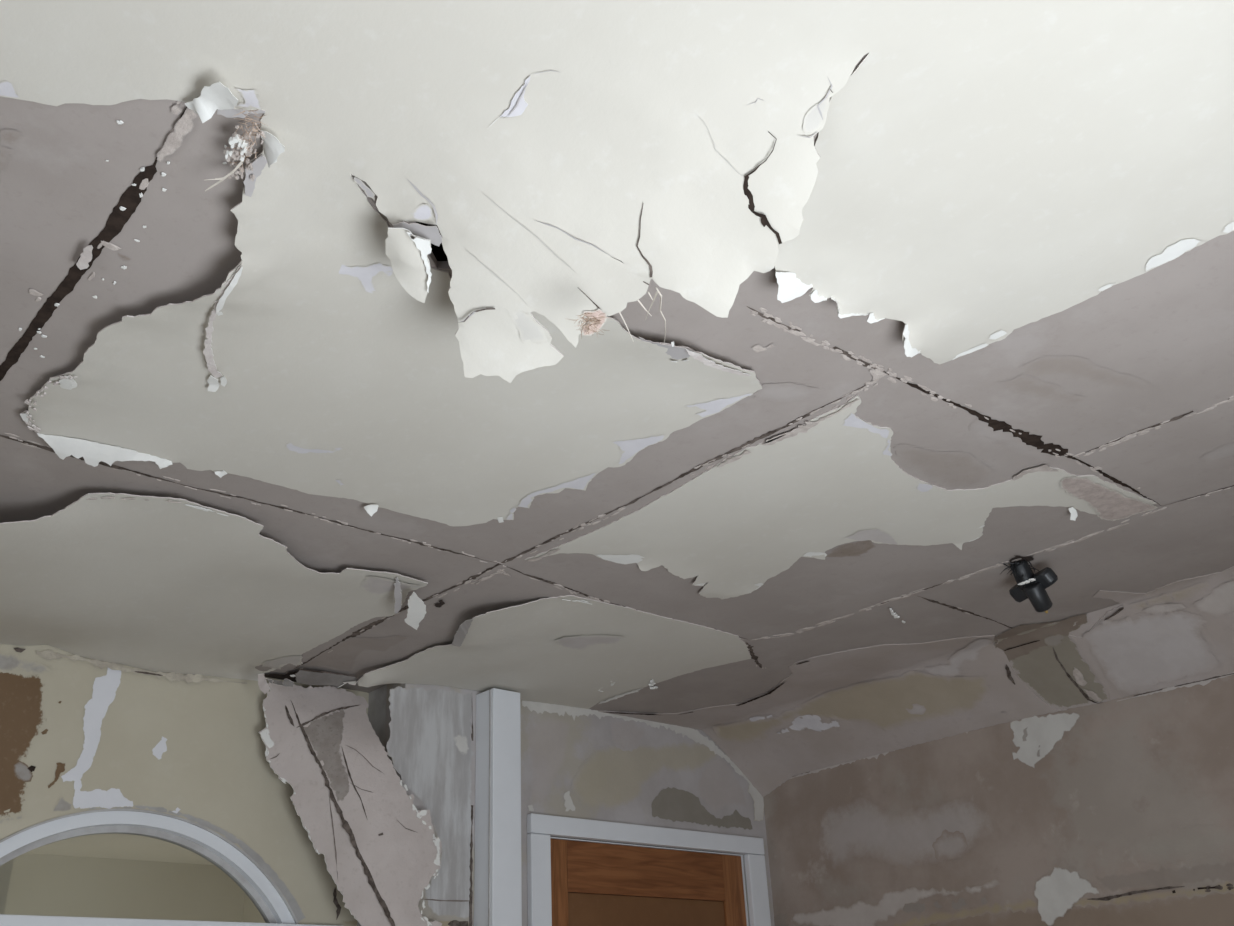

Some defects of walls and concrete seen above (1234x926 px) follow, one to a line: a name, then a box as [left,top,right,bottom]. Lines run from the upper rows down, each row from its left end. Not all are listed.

crack [0,101,198,381]
peeling [364,505,379,517]
crack [0,307,1234,706]
peeling [405,592,426,630]
peeling [0,652,52,824]
peeling [48,762,66,789]